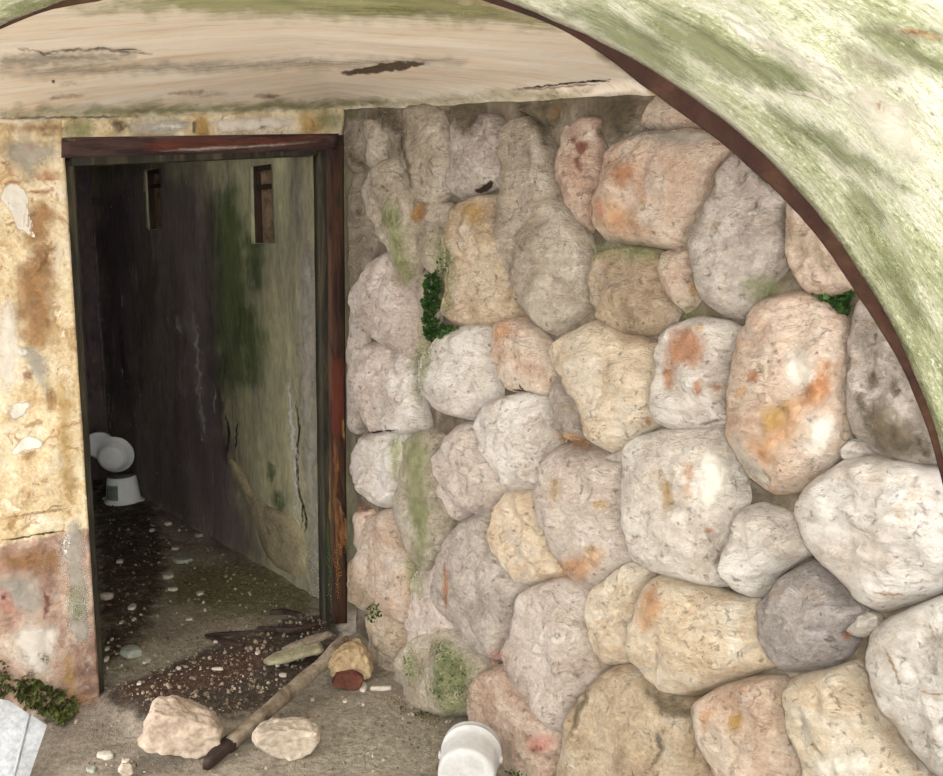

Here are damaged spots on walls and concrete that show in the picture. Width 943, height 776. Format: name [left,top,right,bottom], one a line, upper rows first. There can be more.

crack [39,47,144,56]
crack [524,79,611,89]
peeling [1,183,35,237]
leakage [18,202,54,344]
leakage [87,166,262,551]
peeling [10,402,30,419]
peeling [12,436,42,458]
crack [225,416,238,454]
crack [295,405,307,532]
crack [8,506,58,540]